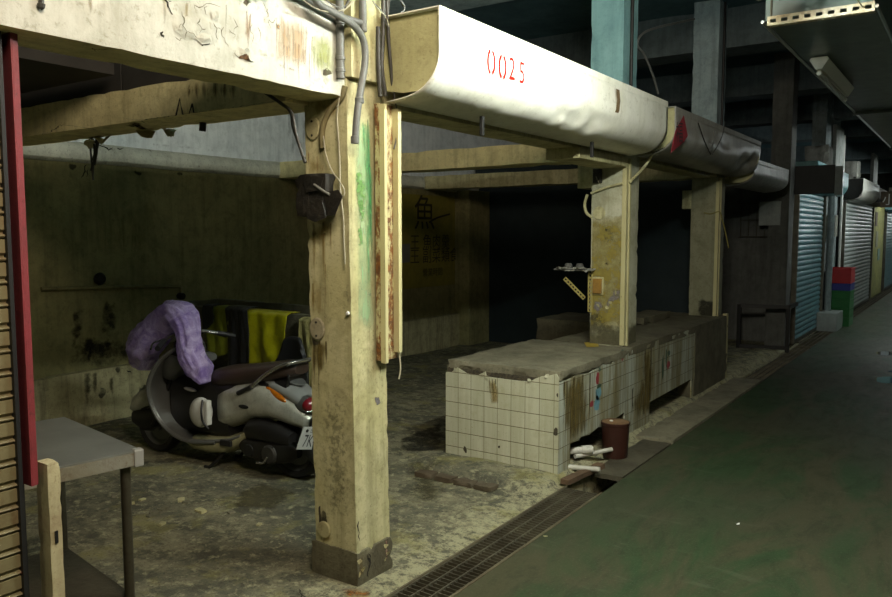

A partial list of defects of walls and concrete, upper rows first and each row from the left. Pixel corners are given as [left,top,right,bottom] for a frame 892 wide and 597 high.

damp [73,313,127,393]